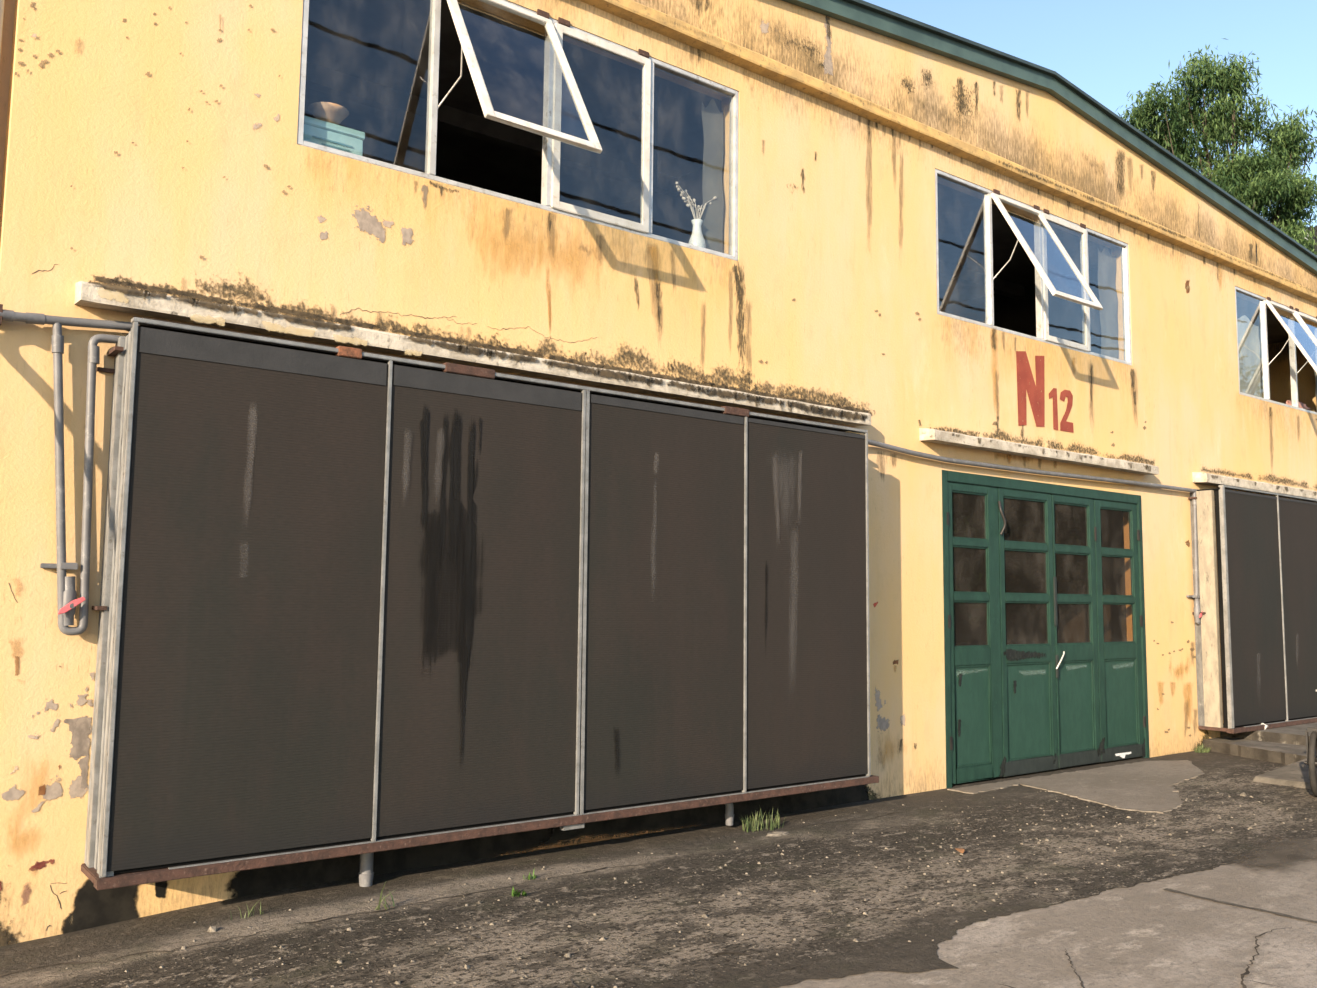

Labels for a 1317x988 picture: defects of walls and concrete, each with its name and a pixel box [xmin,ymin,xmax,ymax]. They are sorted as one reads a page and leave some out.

leakage [902,69,932,92]
leakage [953,78,995,117]
leakage [421,181,457,206]
flaking render [352,205,414,245]
leakage [996,152,1317,293]
leakage [634,248,674,324]
leakage [88,263,874,420]
peeling [1,672,95,813]
leakage [0,921,20,947]
crack [1065,948,1085,988]
crack [1240,927,1292,988]